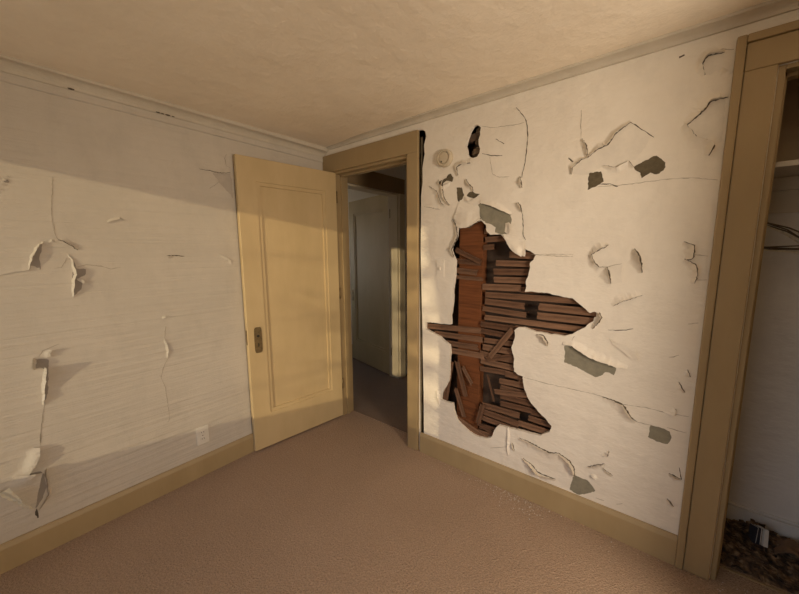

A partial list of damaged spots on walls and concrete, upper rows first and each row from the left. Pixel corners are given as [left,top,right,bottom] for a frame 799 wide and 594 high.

crack [493,110,567,257]
peeling [680,90,728,155]
peeling [0,226,120,297]
flaking render [427,122,628,501]
peeling [0,344,58,518]